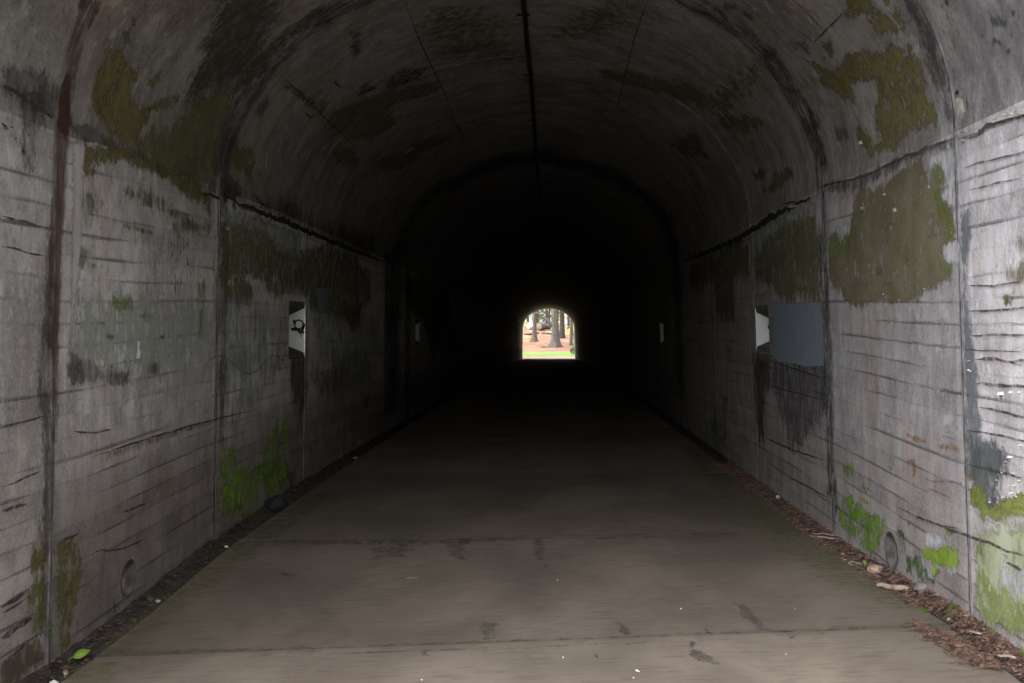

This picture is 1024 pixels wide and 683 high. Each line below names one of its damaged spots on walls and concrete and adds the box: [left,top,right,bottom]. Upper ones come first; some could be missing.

crack [202,193,384,262]
leakage [67,0,686,428]
leakage [675,0,1023,509]
crack [684,98,1024,262]